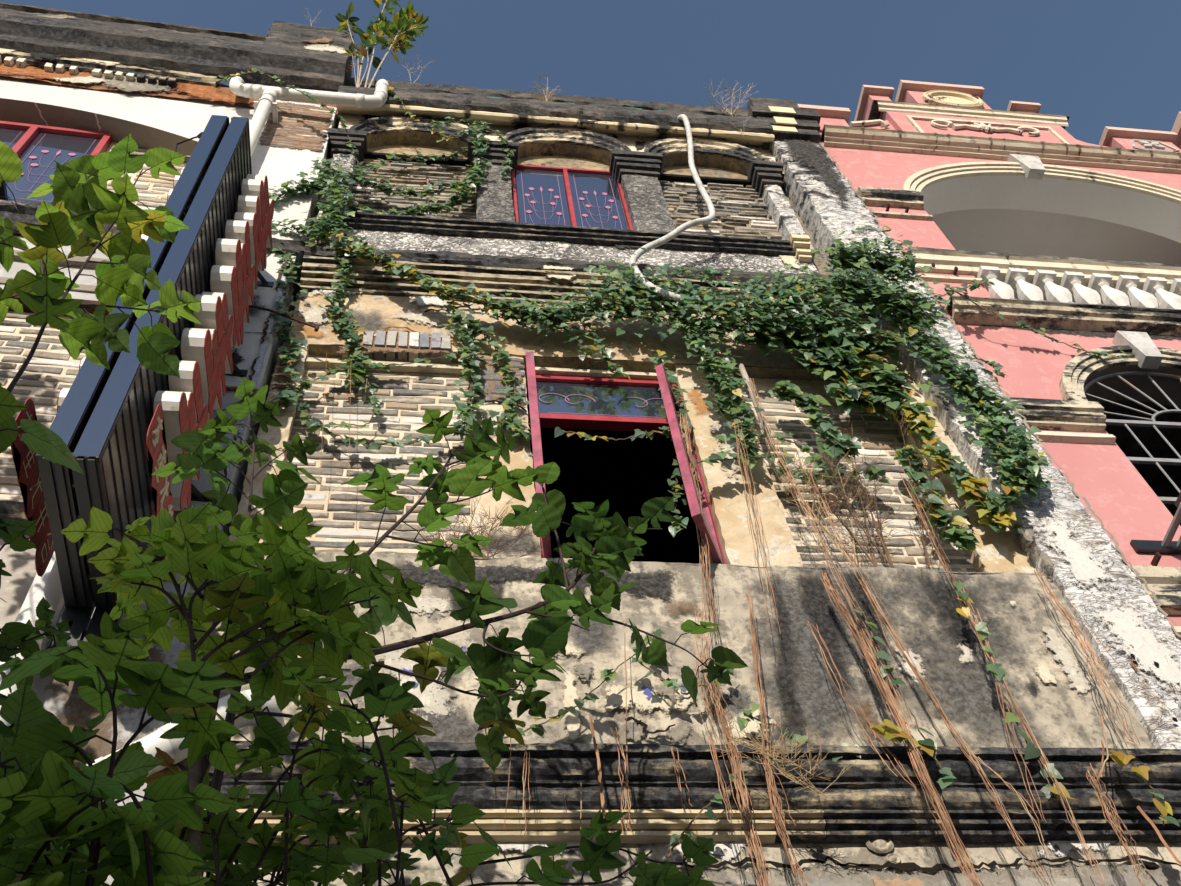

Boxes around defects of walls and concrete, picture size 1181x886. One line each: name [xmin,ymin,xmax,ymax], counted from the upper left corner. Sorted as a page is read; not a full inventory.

flaking render [0,48,254,107]
water stain [777,139,859,205]
peeling [915,270,1181,704]
peeling [398,594,453,617]
peeling [376,640,471,724]
peeling [555,636,595,740]
peeling [597,680,693,745]
water stain [723,691,750,716]
peeling [724,698,776,743]
water stain [747,563,1055,747]
peeling [892,641,926,683]